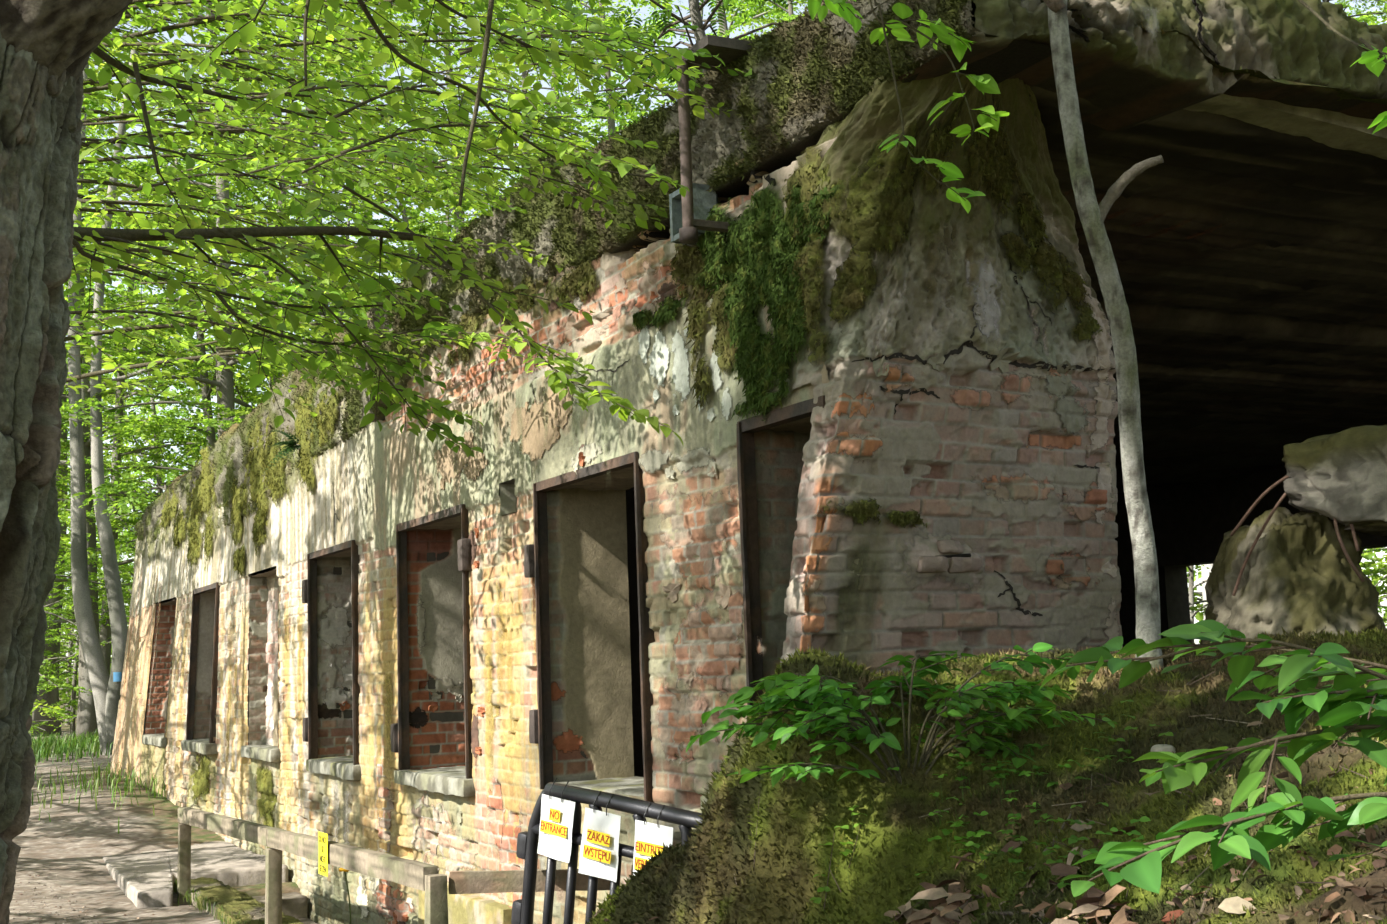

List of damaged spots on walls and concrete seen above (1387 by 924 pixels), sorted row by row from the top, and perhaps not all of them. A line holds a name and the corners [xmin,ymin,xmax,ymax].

flaking render [451,261,732,422]
leakage [966,260,1001,338]
crack [852,258,1115,414]
flaking render [509,382,572,461]
flaking render [571,443,605,472]
spalling [971,274,1116,525]
flaking render [317,606,352,720]
flaking render [409,676,464,729]
spalling [638,447,765,765]
crack [994,564,1043,616]
spalling [368,764,525,883]
spalling [356,873,414,924]